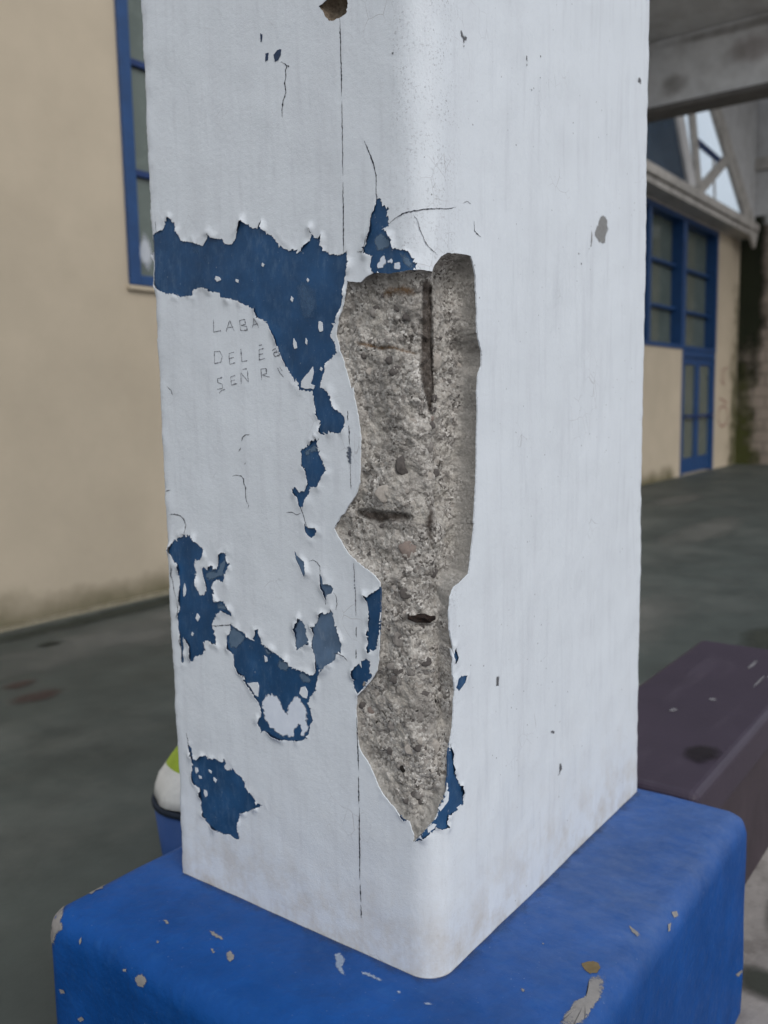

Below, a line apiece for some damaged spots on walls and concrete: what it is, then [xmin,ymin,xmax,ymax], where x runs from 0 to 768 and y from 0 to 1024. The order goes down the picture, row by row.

spalling [320,0,348,21]
crack [336,18,344,96]
crack [342,194,365,253]
crack [391,201,481,255]
crack [345,411,353,485]
spalling [153,198,480,842]
crack [325,564,357,659]
crack [355,718,363,915]
peeling [51,906,65,944]
peeling [123,969,146,987]
peeling [561,961,603,1024]